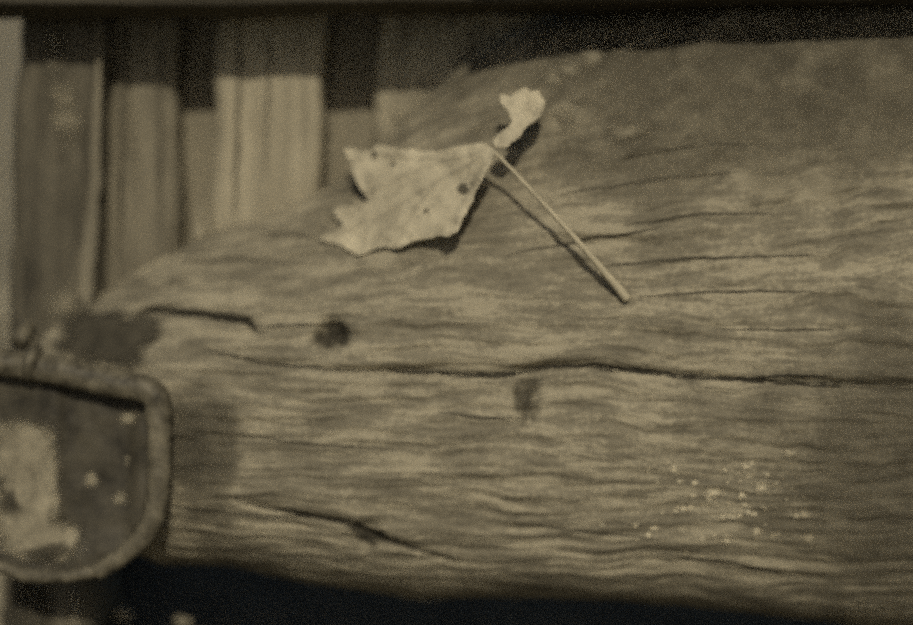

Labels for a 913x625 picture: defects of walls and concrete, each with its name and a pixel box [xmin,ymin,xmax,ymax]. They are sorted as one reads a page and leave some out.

crack [94,307,318,334]
crack [718,325,849,333]
crack [208,350,913,390]
crack [168,500,363,528]
crack [383,536,459,564]